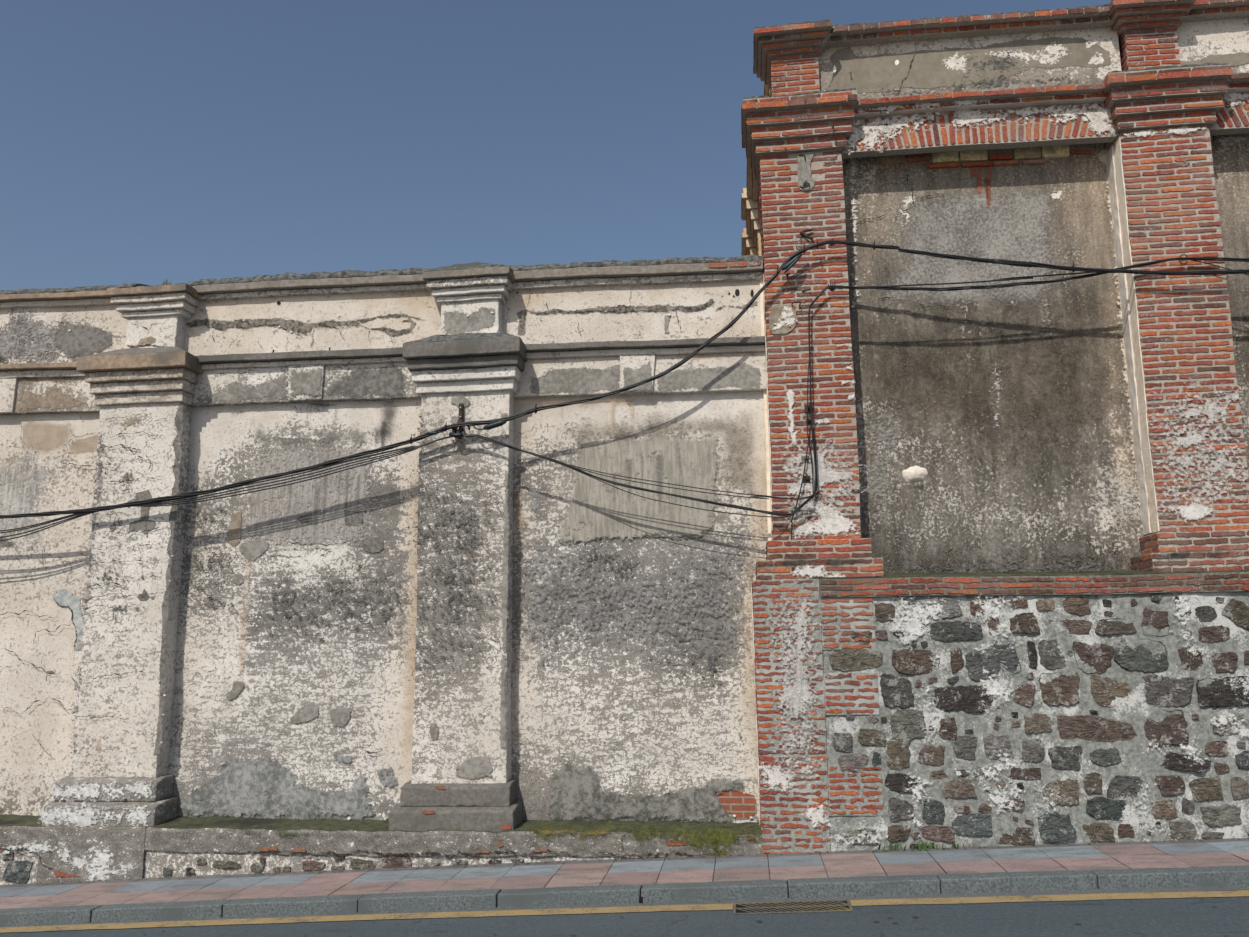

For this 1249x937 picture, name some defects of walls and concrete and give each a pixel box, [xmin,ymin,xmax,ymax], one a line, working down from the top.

flaking render [825,37,1111,95]
flaking render [0,308,112,363]
damp [1080,471,1138,525]
crack [0,414,172,755]
peeling [52,403,184,755]
damp [183,390,912,796]
damp [799,804,888,851]